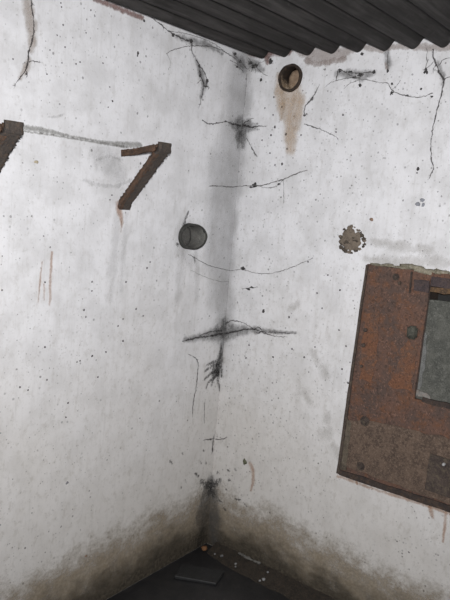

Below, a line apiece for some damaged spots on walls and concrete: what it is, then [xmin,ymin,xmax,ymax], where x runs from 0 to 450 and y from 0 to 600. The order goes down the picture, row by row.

crack [13,1,40,86]
crack [154,19,208,105]
crack [202,118,266,155]
crack [303,86,338,139]
crack [429,49,448,178]
corrosion [118,151,159,209]
spalling [338,225,367,254]
crack [182,320,295,417]
water stain [9,473,440,600]